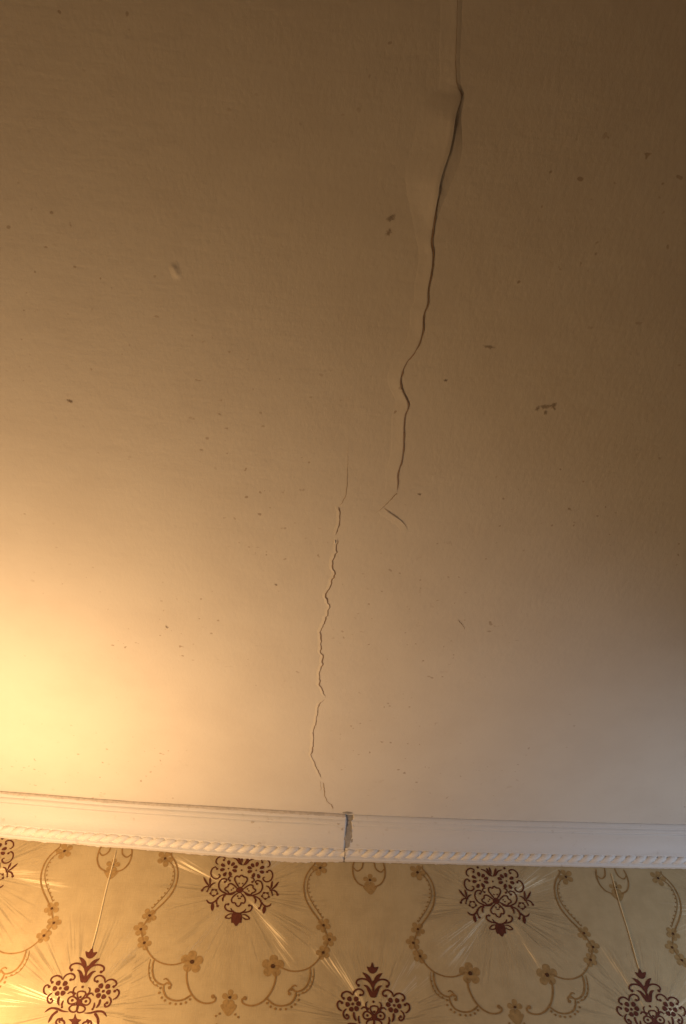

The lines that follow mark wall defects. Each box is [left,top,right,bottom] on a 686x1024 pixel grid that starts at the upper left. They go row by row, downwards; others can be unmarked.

crack [439,0,465,123]
crack [378,199,439,532]
crack [308,465,353,860]